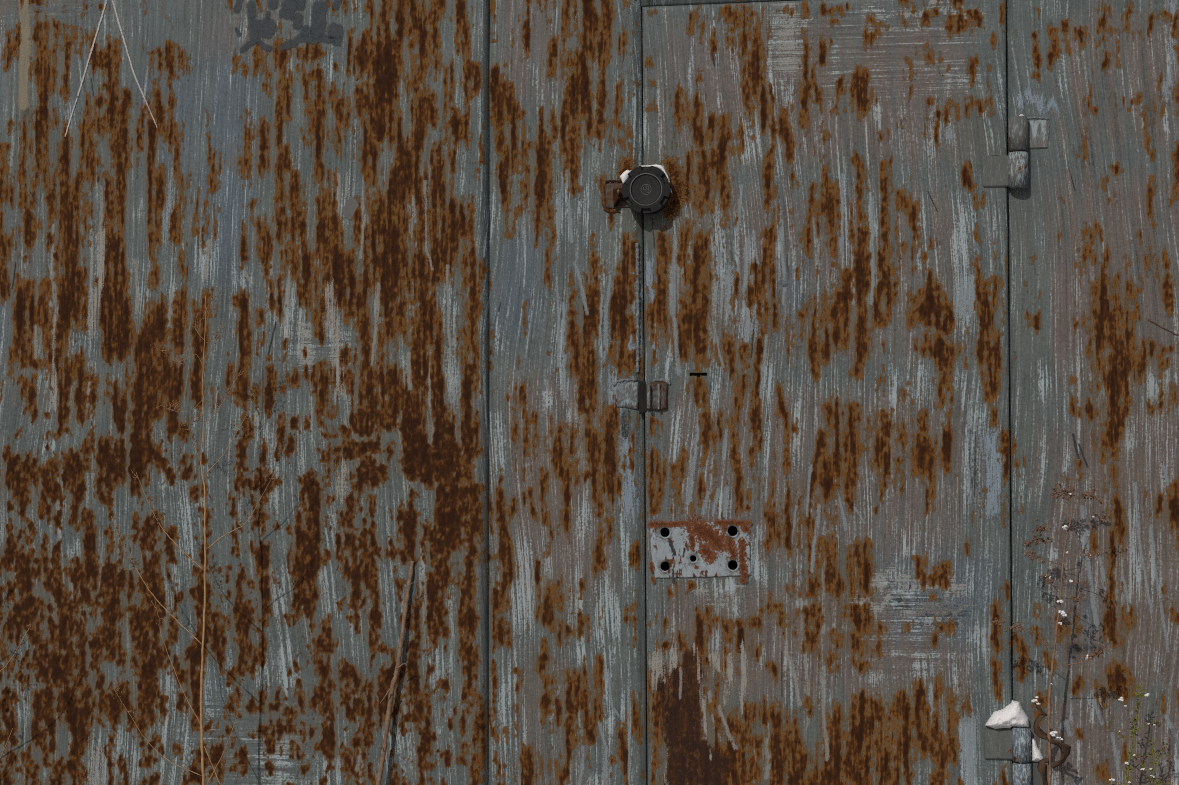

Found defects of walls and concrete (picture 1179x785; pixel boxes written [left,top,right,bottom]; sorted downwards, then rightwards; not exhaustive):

rust [0,0,646,785]
rust [609,0,1025,785]
rust [1023,254,1041,335]
rust [990,580,1083,703]
rust [1031,0,1179,741]
rust [1092,741,1128,785]